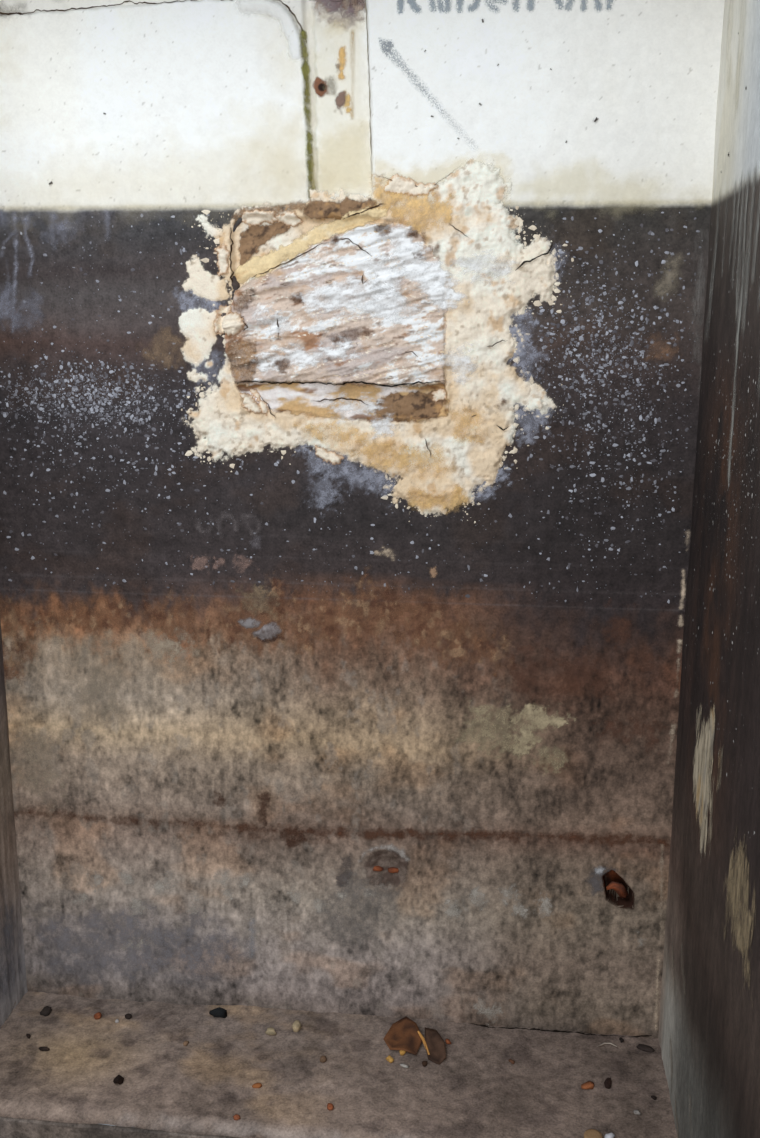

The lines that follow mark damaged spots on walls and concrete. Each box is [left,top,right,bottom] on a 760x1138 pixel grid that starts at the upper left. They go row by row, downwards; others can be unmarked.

crack [0,0,195,15]
rust [315,0,365,38]
rust [313,47,351,112]
flaking render [178,159,574,526]
water stain [728,172,760,484]
rust [221,574,505,676]
peeling [693,706,715,853]
spalling [589,868,634,909]